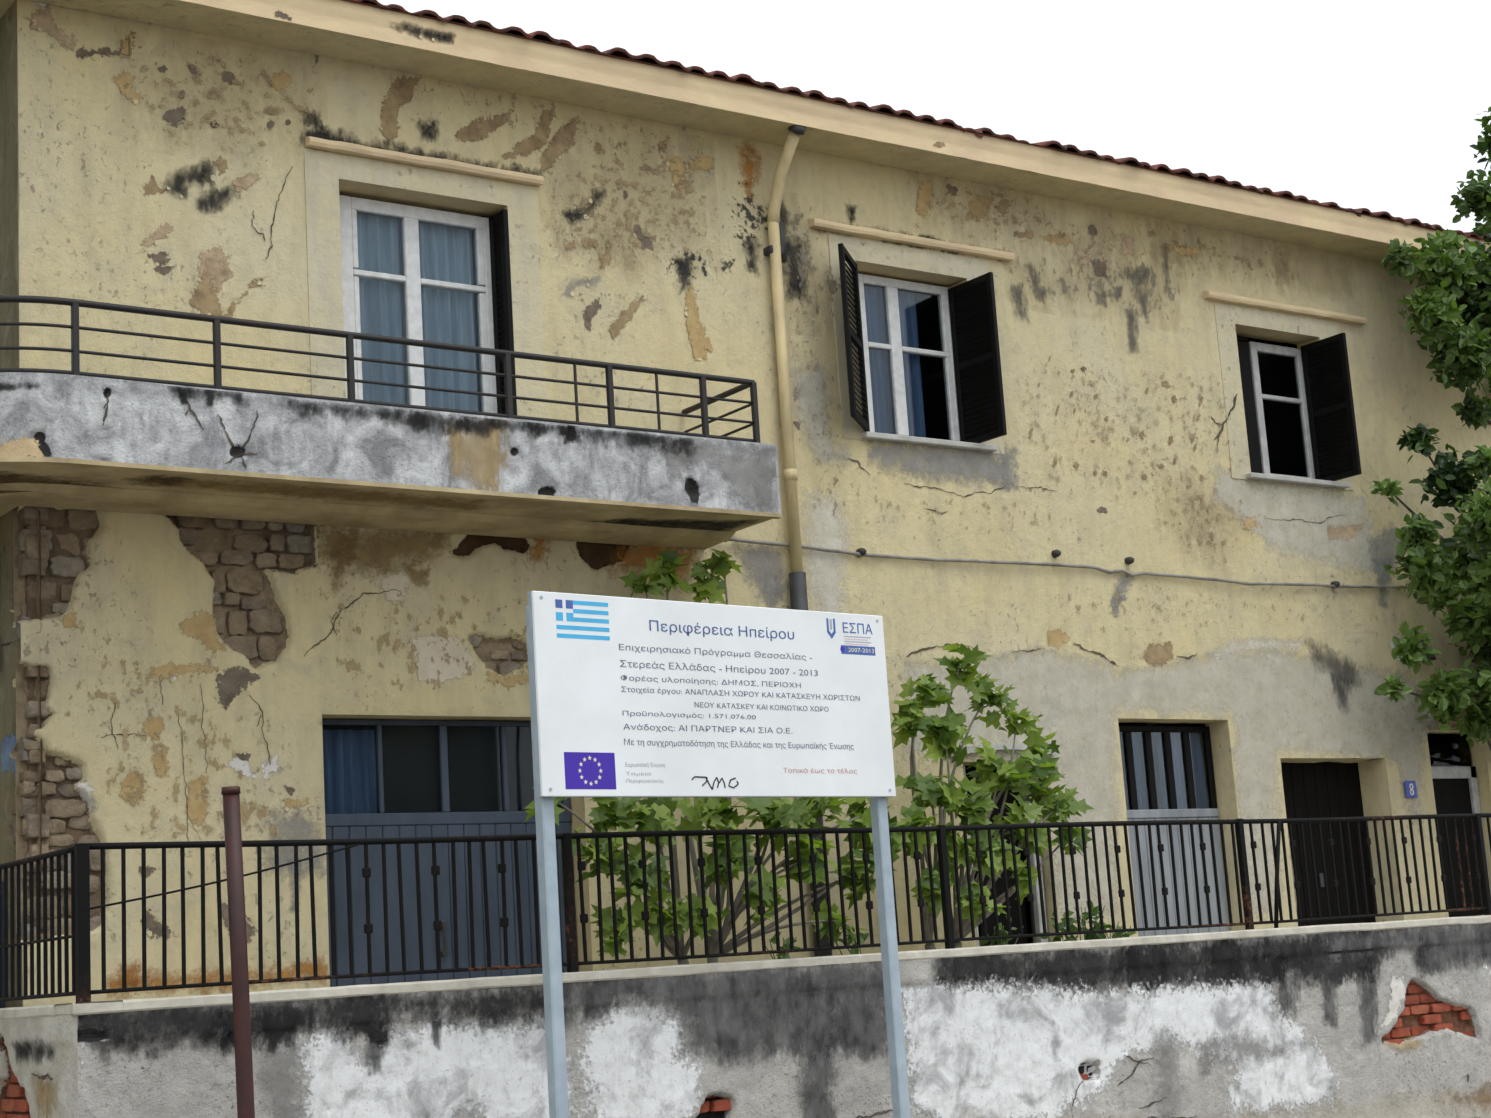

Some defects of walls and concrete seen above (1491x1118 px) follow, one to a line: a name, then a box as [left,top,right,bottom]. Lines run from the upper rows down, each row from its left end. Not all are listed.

crack [252,166,293,259]
leakage [660,182,806,298]
crack [185,401,258,469]
crack [304,589,400,656]
flaking render [320,566,529,696]
flaking render [9,506,347,948]
flaking render [0,1033,30,1118]
leakage [77,966,544,1118]
flaking render [693,1095,735,1118]
leakage [563,961,887,1118]
leakage [935,923,1491,1042]
flaking render [1380,975,1483,1050]